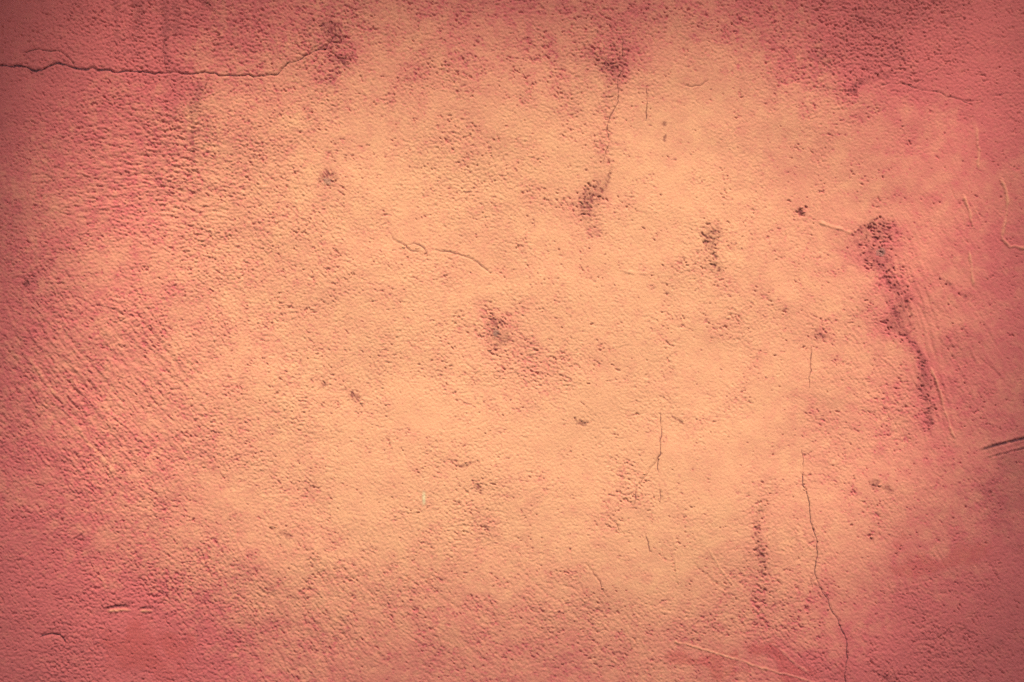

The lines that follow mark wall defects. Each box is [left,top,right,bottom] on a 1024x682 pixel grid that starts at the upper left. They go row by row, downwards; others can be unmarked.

crack [3,40,332,77]
crack [802,454,848,682]